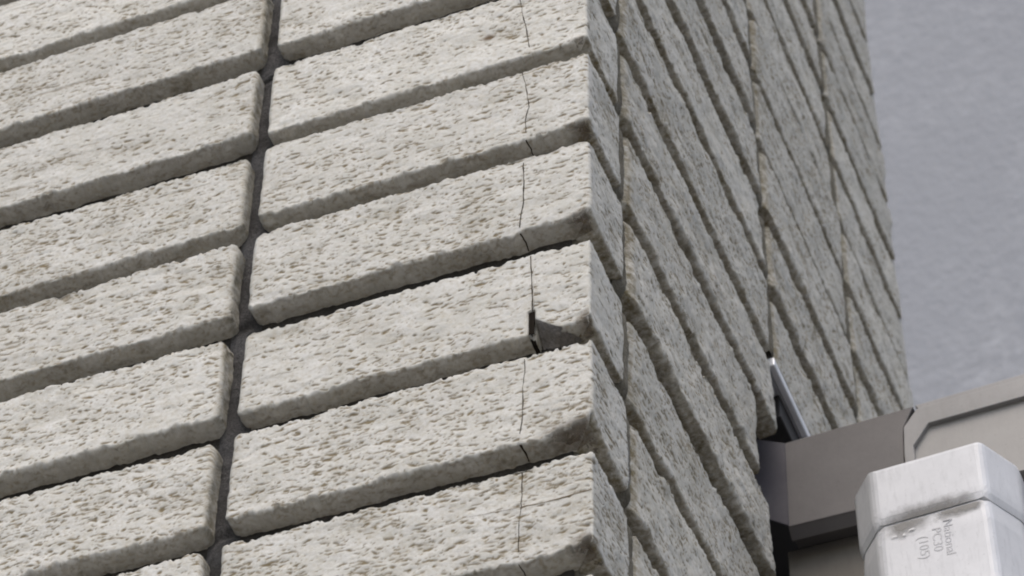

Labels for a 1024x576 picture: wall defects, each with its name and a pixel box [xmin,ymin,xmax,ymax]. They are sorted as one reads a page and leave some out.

crack [519,73,534,312]
spalling [529,312,582,354]
crack [458,359,604,576]